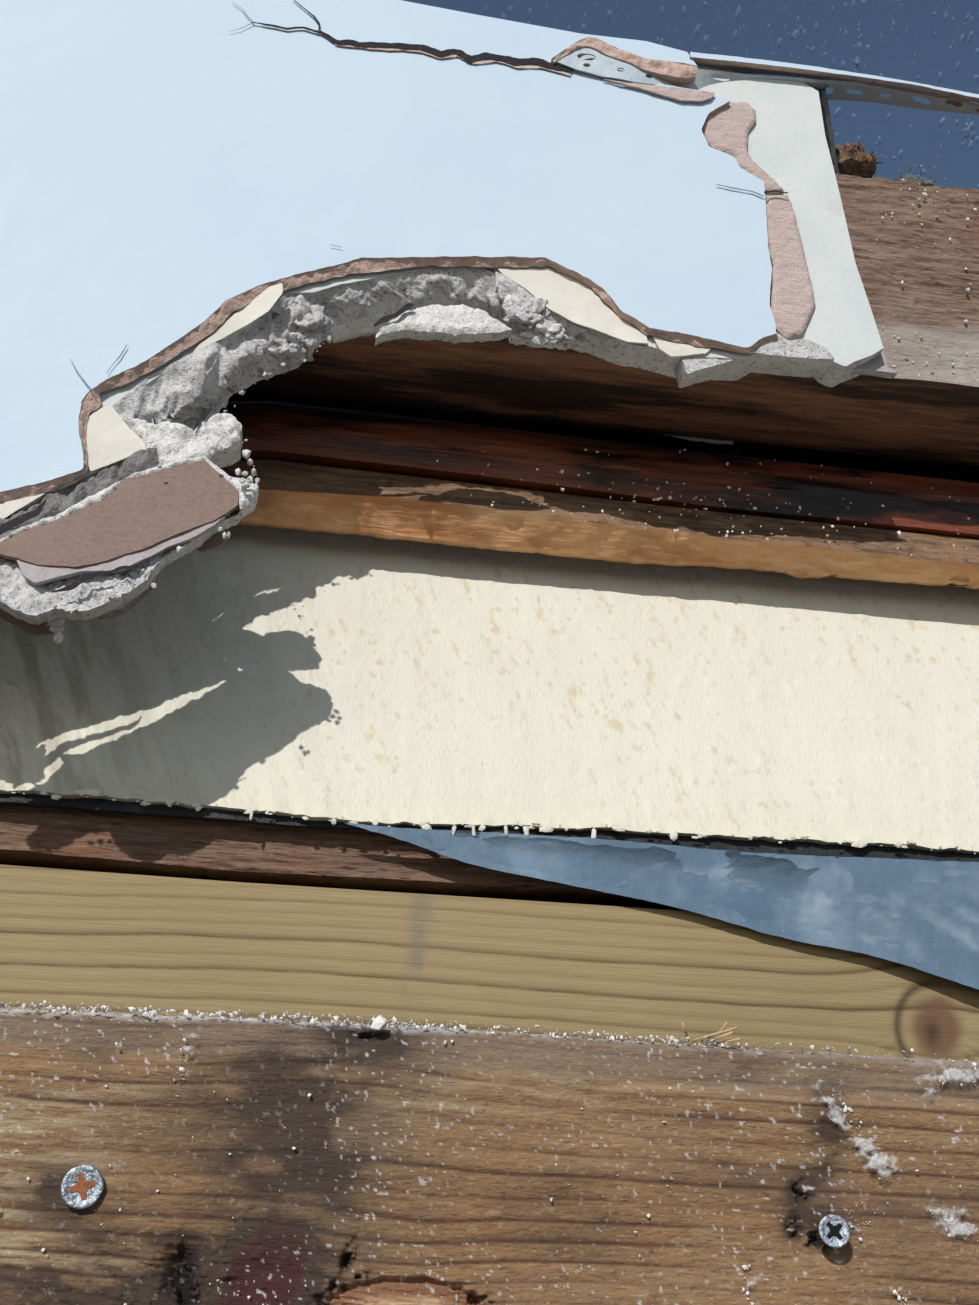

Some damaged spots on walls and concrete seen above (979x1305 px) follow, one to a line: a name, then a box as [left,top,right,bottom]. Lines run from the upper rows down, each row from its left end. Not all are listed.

crack [228,0,573,76]
flaking render [0,37,979,519]